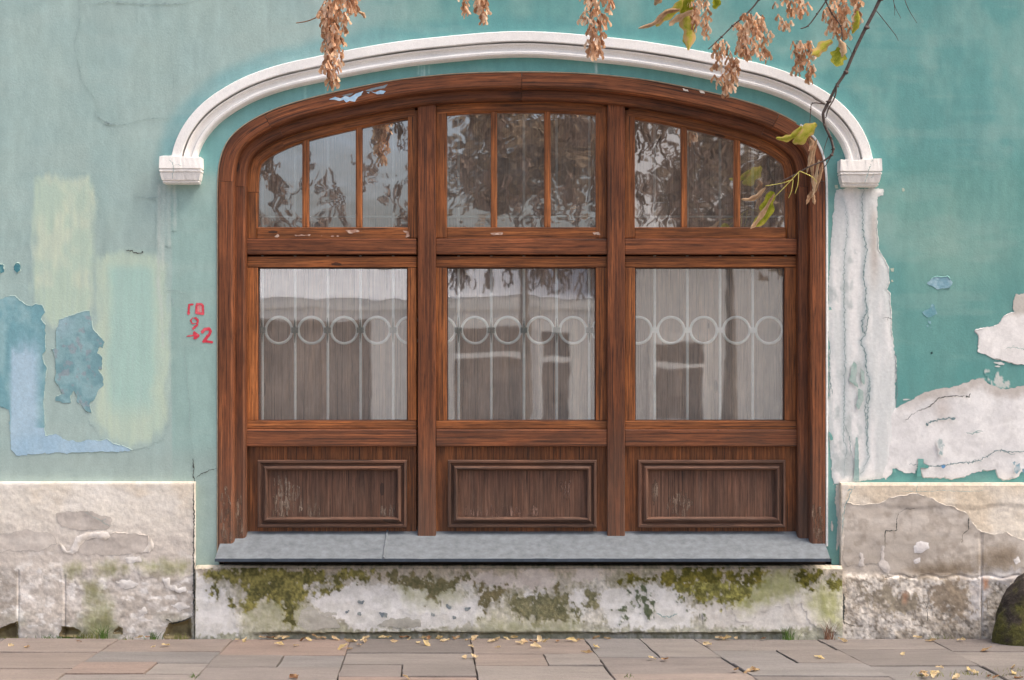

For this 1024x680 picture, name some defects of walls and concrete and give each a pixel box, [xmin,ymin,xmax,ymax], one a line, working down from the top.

peeling [330,84,388,102]
peeling [0,295,132,456]
flaking render [828,185,1024,623]
crack [884,354,1024,536]
spalling [0,511,154,564]
peeling [116,579,138,589]
crack [166,460,217,624]
water stain [389,575,586,639]